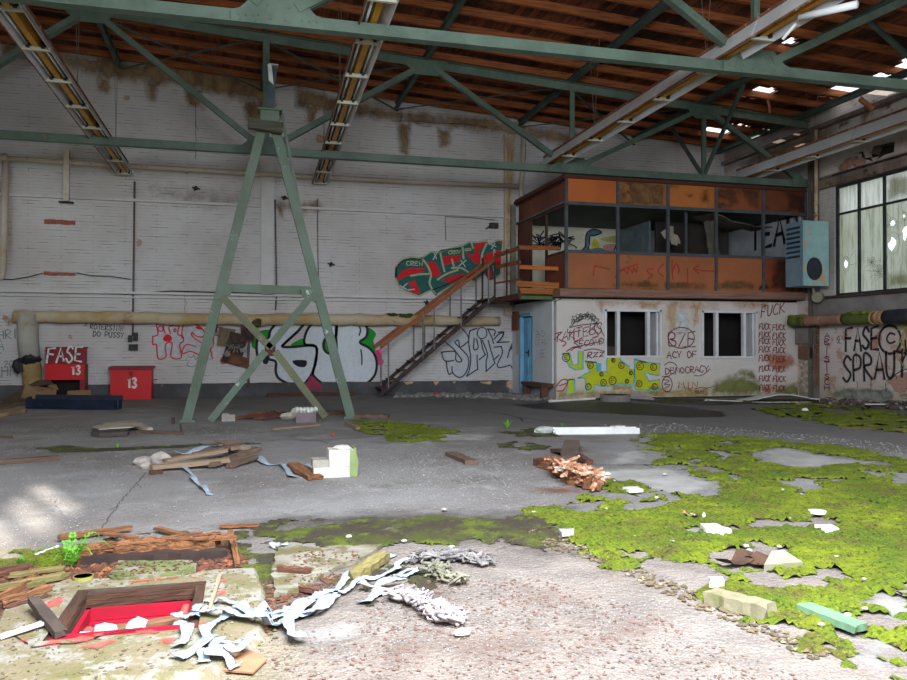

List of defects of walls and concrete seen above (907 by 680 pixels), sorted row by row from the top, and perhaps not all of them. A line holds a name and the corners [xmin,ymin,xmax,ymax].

leakage [58,51,263,119]
leakage [297,90,336,122]
leakage [356,104,576,162]
crack [102,472,146,528]